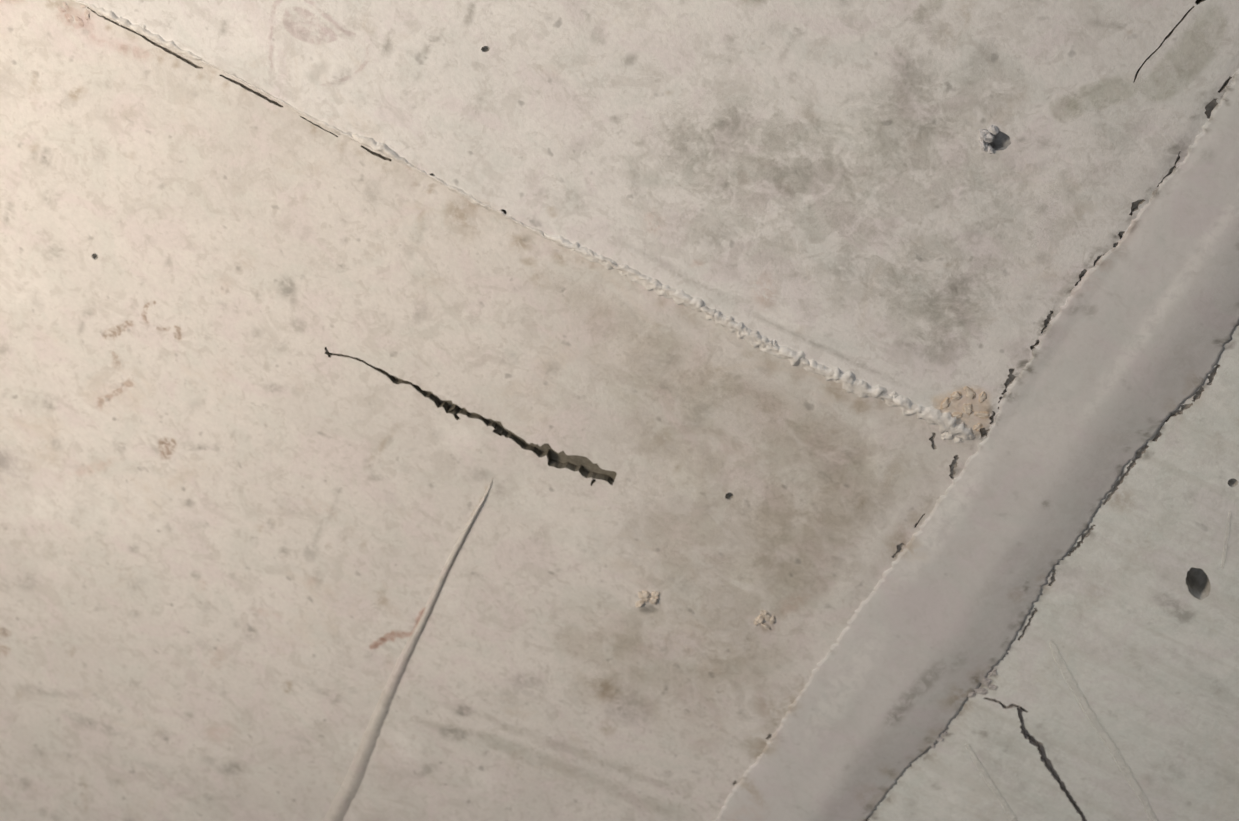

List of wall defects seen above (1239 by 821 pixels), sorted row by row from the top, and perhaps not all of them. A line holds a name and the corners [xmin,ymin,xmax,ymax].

crack [325,347,617,486]
crack [984,698,1087,821]